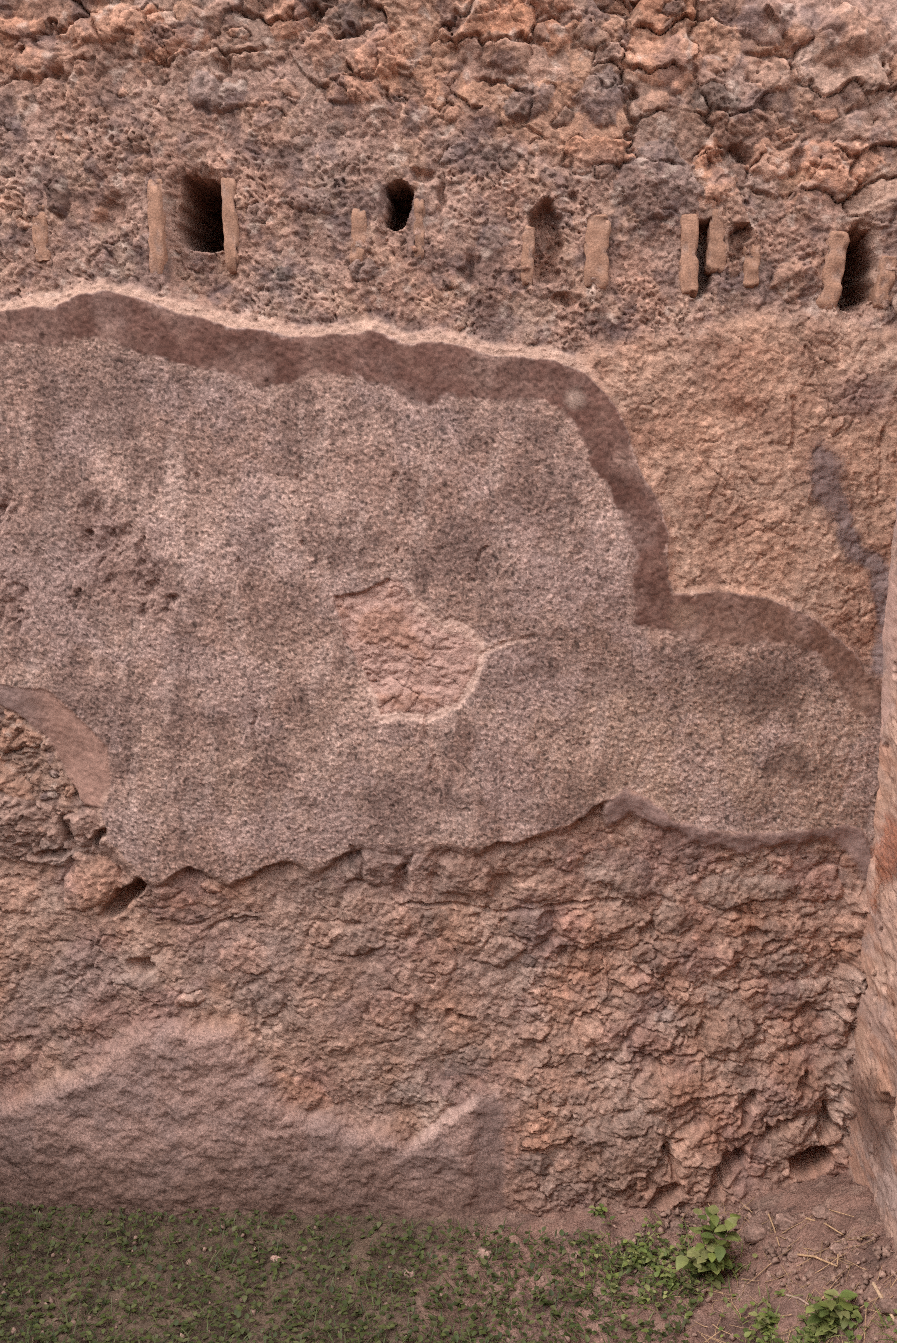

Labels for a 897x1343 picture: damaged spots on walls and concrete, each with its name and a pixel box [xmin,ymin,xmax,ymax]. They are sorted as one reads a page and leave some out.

crack [423,714,444,785]
flaking render [0,311,897,1253]